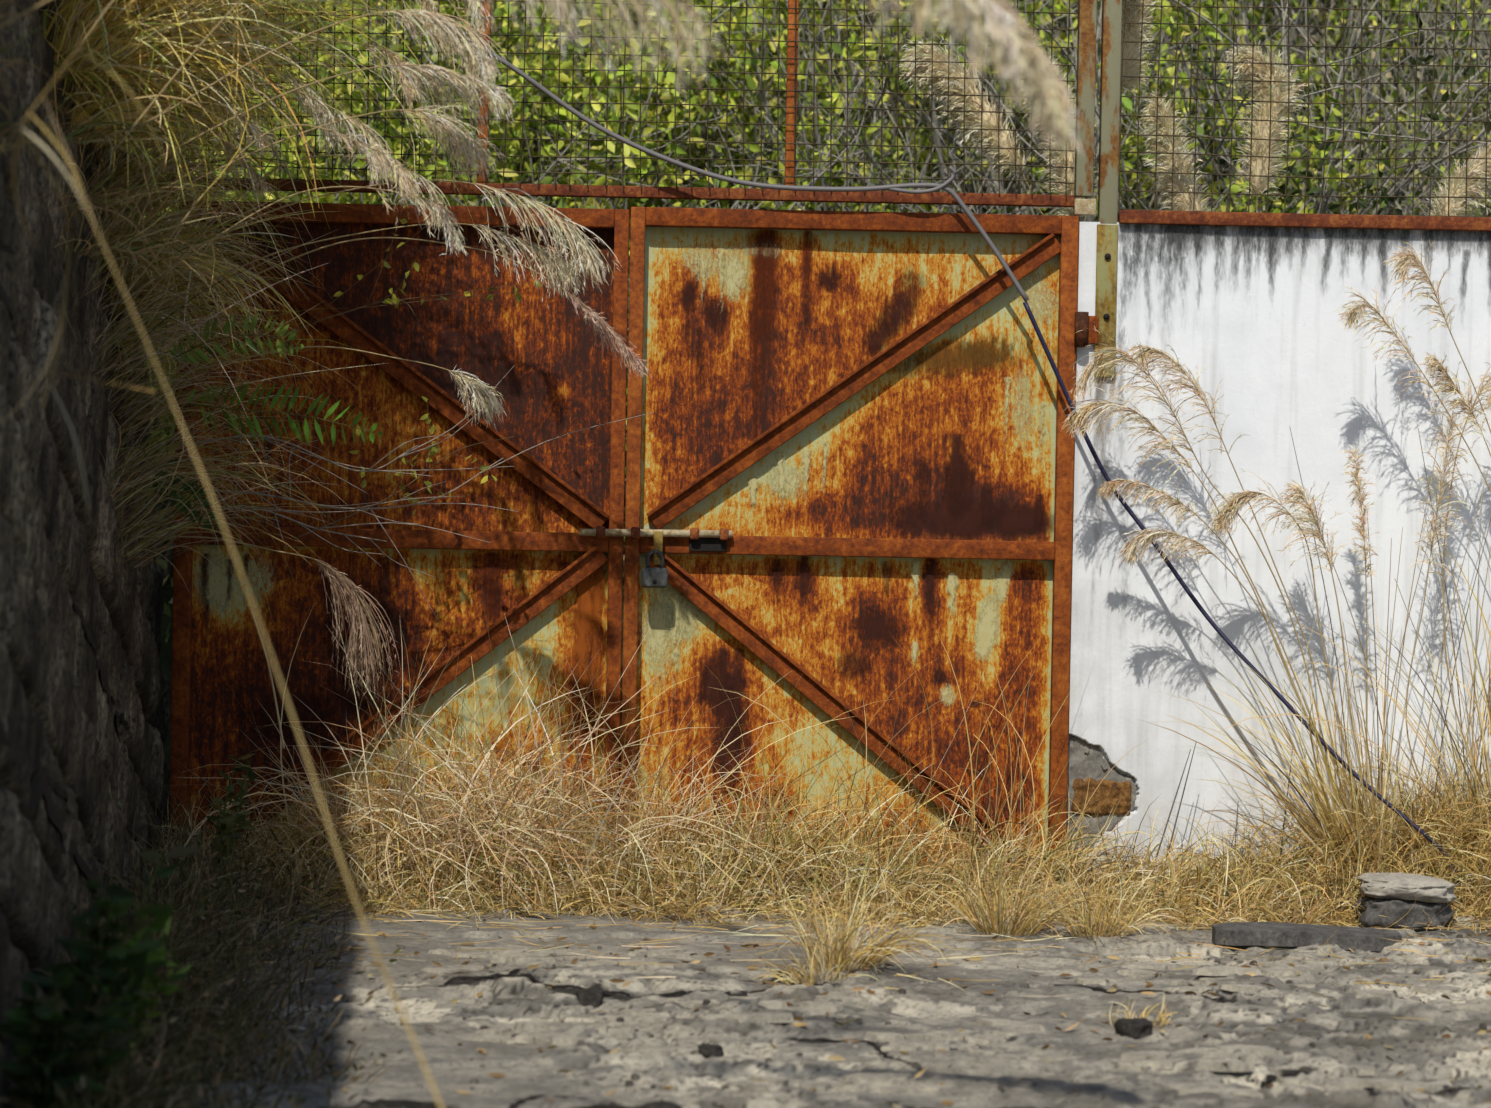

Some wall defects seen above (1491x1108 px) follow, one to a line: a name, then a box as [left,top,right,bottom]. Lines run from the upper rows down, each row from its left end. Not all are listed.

rust [805,231,841,290]
leakage [1121,224,1491,293]
rust [684,285,727,372]
rust [867,273,920,353]
rust [895,337,1012,375]
rust [893,434,1051,539]
rust [926,559,936,615]
rust [254,557,395,739]
rust [569,564,607,756]
rust [701,648,749,787]
spalling [1068,735,1137,858]
crack [413,967,832,997]